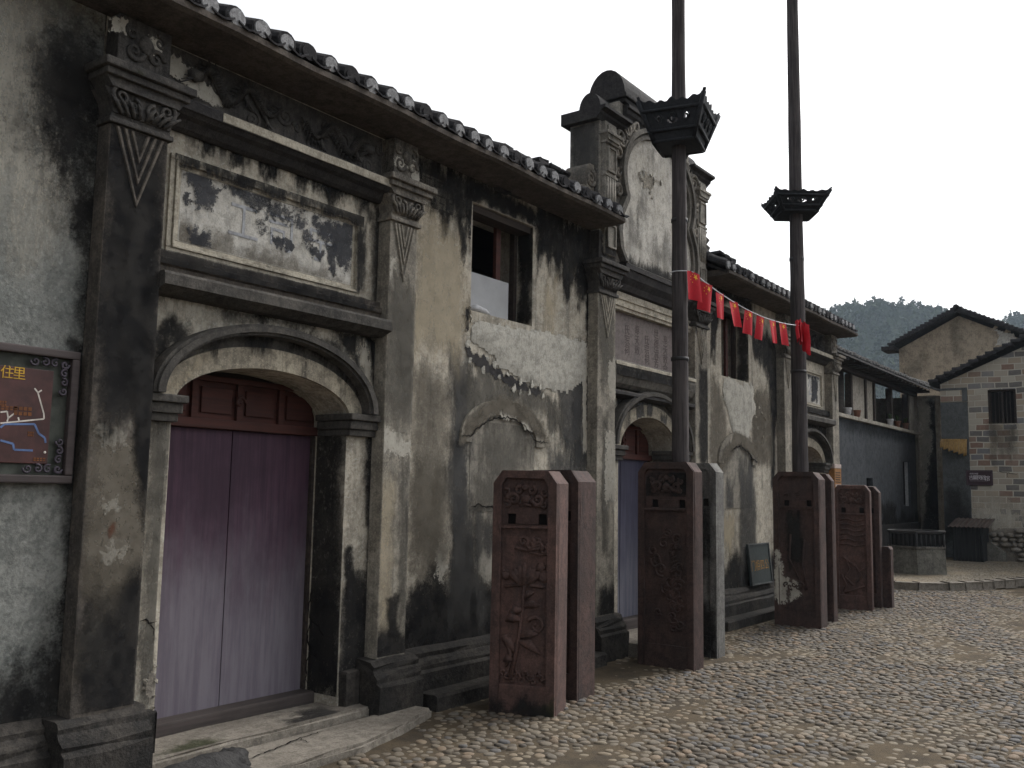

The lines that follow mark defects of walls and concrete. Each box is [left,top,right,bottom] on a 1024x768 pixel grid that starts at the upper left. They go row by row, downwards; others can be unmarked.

water stain [0,16,672,724]
flaking render [463,305,545,399]
water stain [689,284,777,589]
water stain [703,599,716,658]